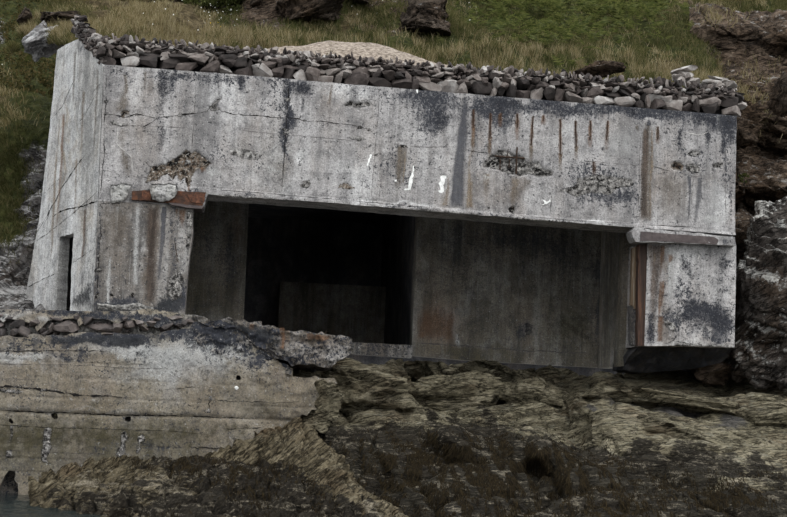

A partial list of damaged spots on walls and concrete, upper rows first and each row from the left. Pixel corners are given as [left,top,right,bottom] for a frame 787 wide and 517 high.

crack [81,82,372,132]
crack [37,145,125,241]
spalling [146,149,212,190]
water stain [438,99,467,205]
spalling [484,147,554,177]
crack [77,223,109,289]
water stain [51,335,145,357]
crack [0,385,122,398]